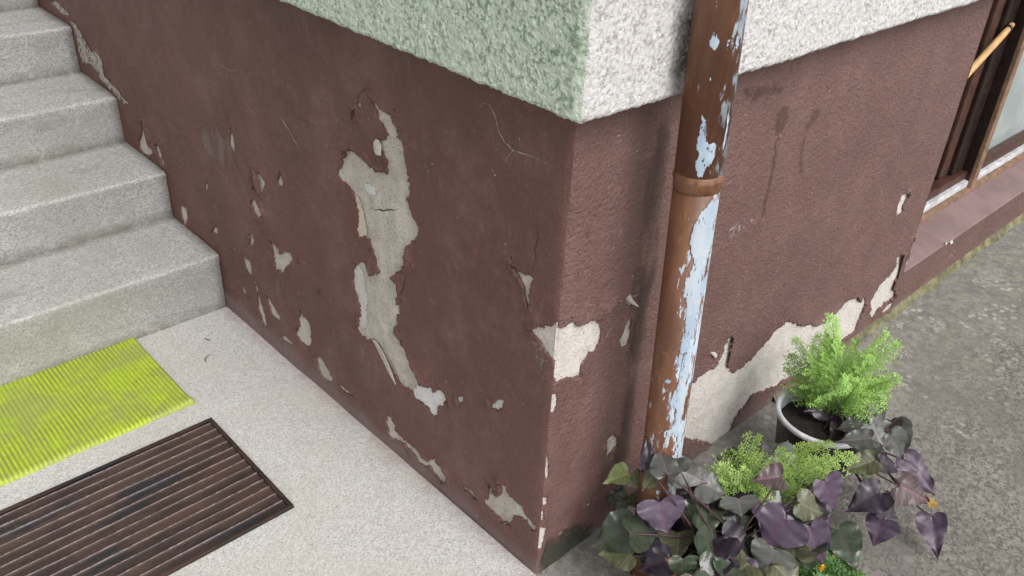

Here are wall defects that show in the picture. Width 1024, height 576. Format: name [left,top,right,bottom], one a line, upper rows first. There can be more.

peeling [52,1,128,104]
crack [479,103,545,163]
peeling [338,103,463,416]
peeling [532,321,600,412]
peeling [664,199,907,443]
peeling [387,416,446,482]
peeling [465,485,547,548]